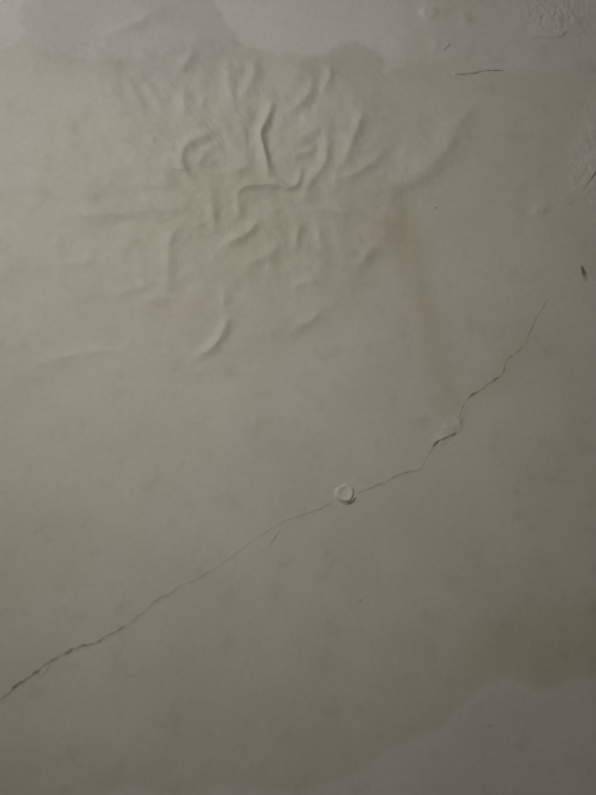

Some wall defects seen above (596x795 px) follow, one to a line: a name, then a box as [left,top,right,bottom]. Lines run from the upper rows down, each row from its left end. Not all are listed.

crack [0,297,548,702]
damp [443,585,596,705]